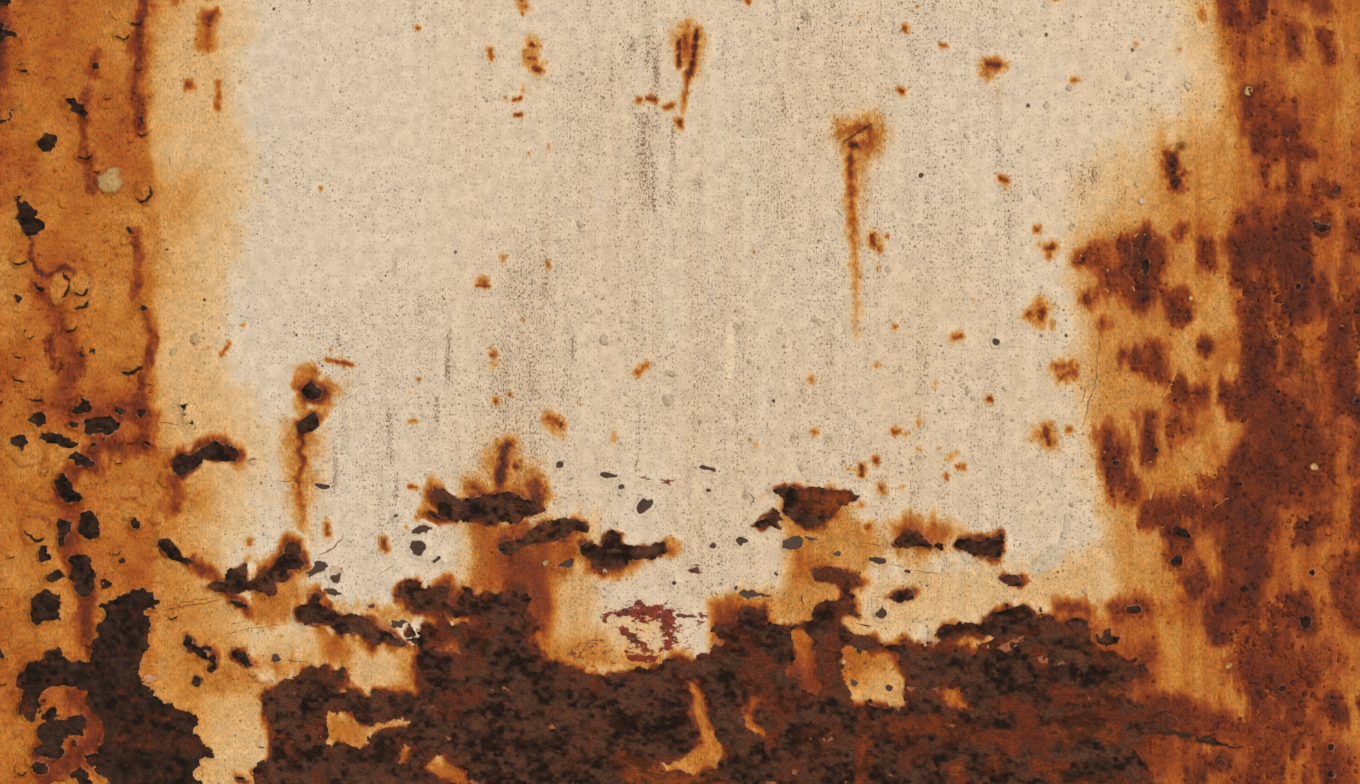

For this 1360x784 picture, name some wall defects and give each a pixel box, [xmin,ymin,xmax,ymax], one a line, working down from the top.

rust [481,0,555,122]
rust [630,7,719,136]
rust [0,0,402,784]
rust [677,0,1360,784]
rust [442,522,504,588]
rust [524,548,615,633]
peeling [0,387,1203,784]